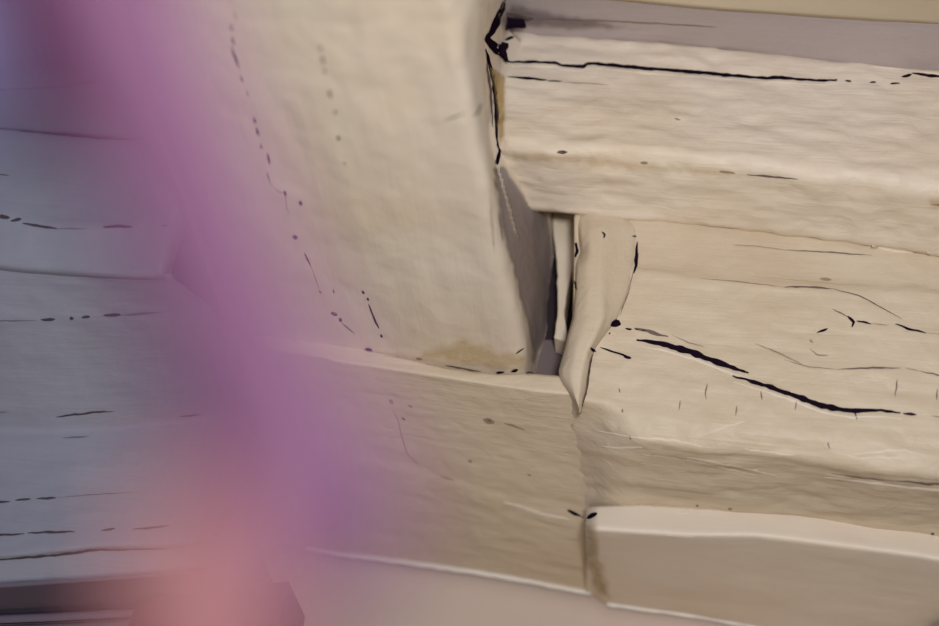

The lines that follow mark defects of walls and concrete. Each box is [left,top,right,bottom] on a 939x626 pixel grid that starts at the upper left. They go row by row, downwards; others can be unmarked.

crack [254,117,303,212]
crack [443,49,939,251]
crack [293,235,383,351]
crack [445,348,534,374]
crack [582,235,939,419]
crack [824,473,939,492]